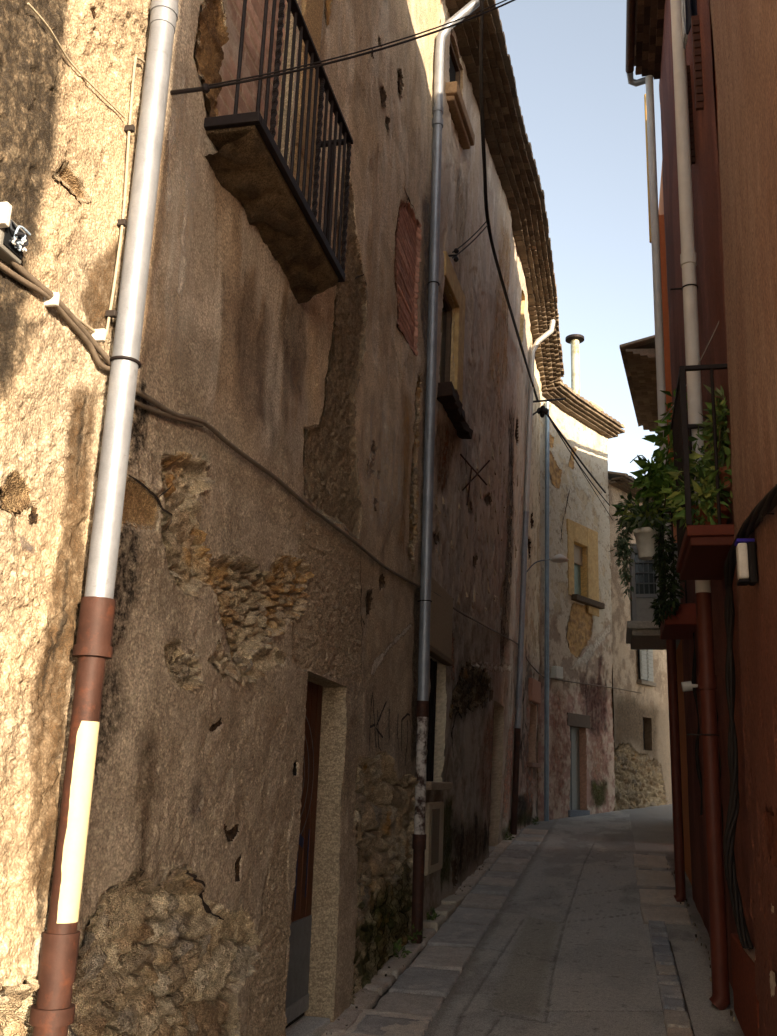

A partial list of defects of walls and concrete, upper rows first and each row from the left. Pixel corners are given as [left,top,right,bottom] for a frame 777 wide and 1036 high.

spalling [194,0,229,117]
spalling [303,155,381,540]
spalling [394,200,422,356]
spalling [122,451,315,691]
spalling [566,603,593,658]
crack [186,870,224,920]